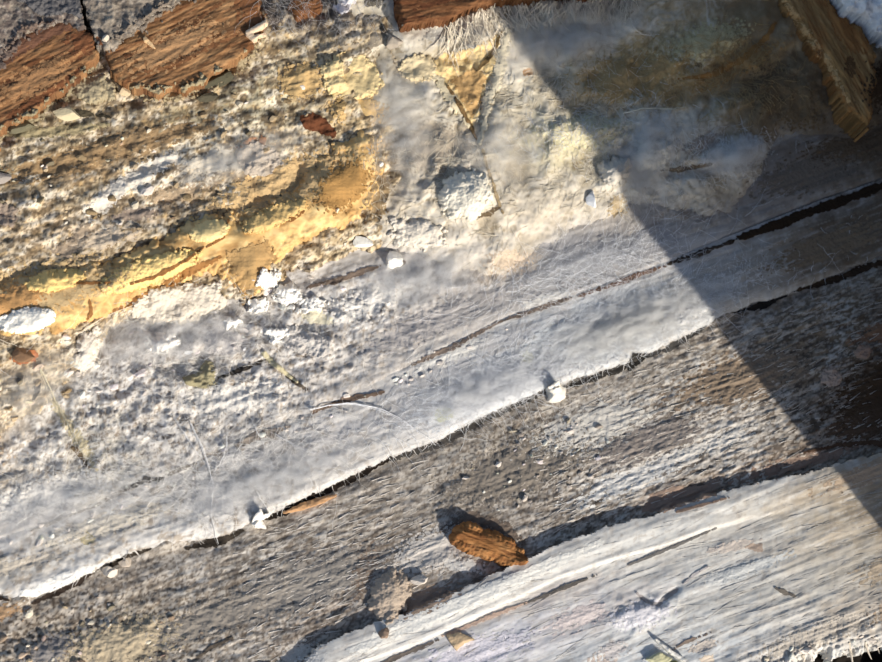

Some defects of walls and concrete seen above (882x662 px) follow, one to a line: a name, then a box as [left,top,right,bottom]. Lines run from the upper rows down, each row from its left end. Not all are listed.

crack [80,0,92,33]
spalling [234,140,284,177]
leakage [0,113,239,263]
crack [306,260,406,289]
crack [412,182,882,366]
crack [185,326,707,550]
leakage [728,446,858,485]
leakage [642,477,721,514]
crack [628,527,717,566]
leakage [18,552,99,602]
crack [31,548,152,605]
leakage [393,581,462,620]